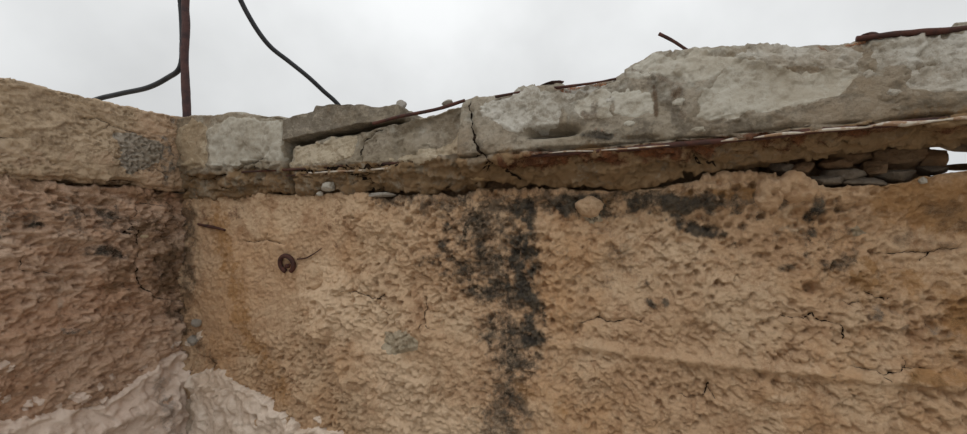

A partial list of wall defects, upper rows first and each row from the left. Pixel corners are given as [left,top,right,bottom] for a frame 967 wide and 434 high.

spalling [372,99,465,125]
crack [468,102,521,184]
rust [497,131,824,170]
spalling [480,25,967,158]
rust [837,127,899,138]
damp [547,190,736,244]
damp [419,196,546,433]